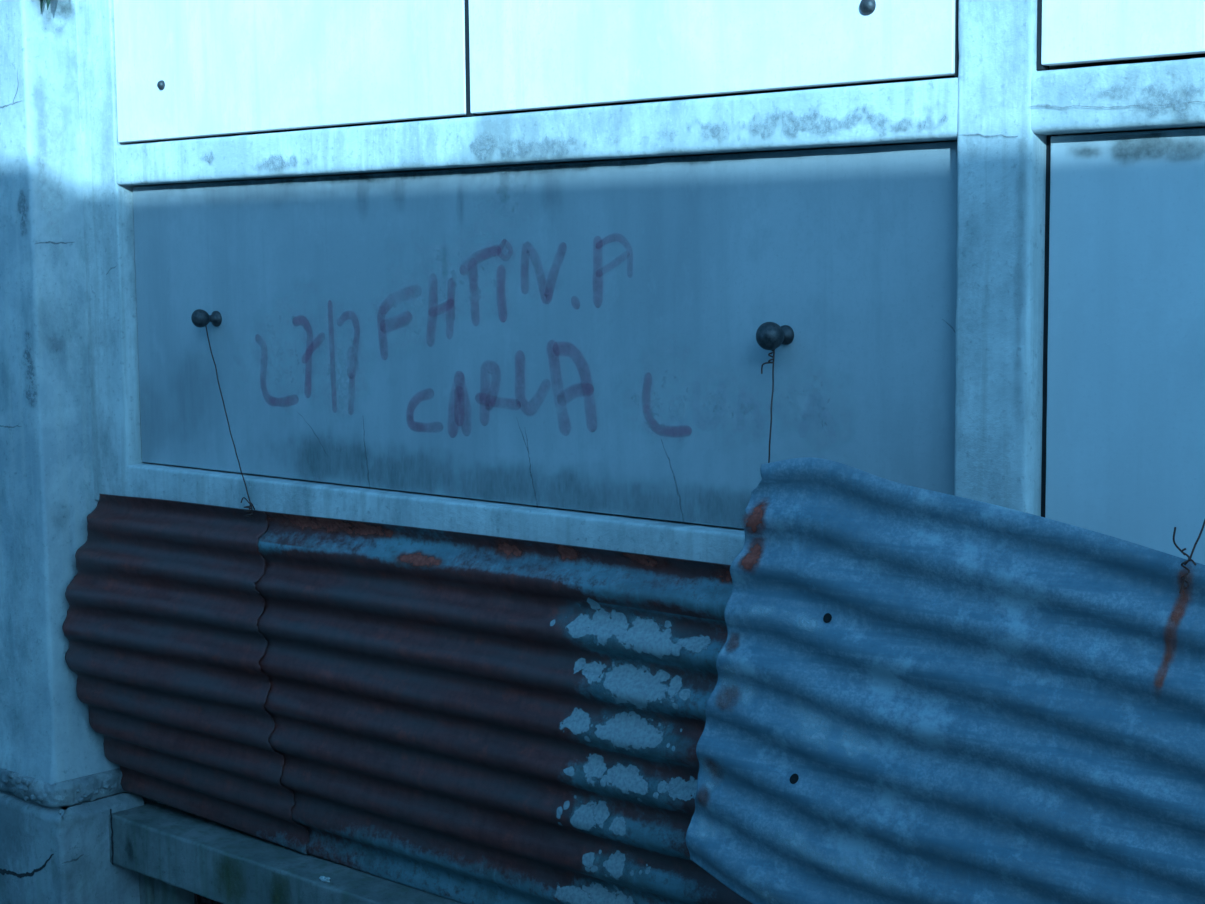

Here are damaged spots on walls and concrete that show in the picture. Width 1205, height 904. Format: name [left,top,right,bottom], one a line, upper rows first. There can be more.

corrosion [266,513,397,538]
corrosion [717,502,767,583]
corrosion [1156,571,1189,687]
peeling [550,597,711,904]
crack [0,854,82,878]
crack [108,809,116,864]